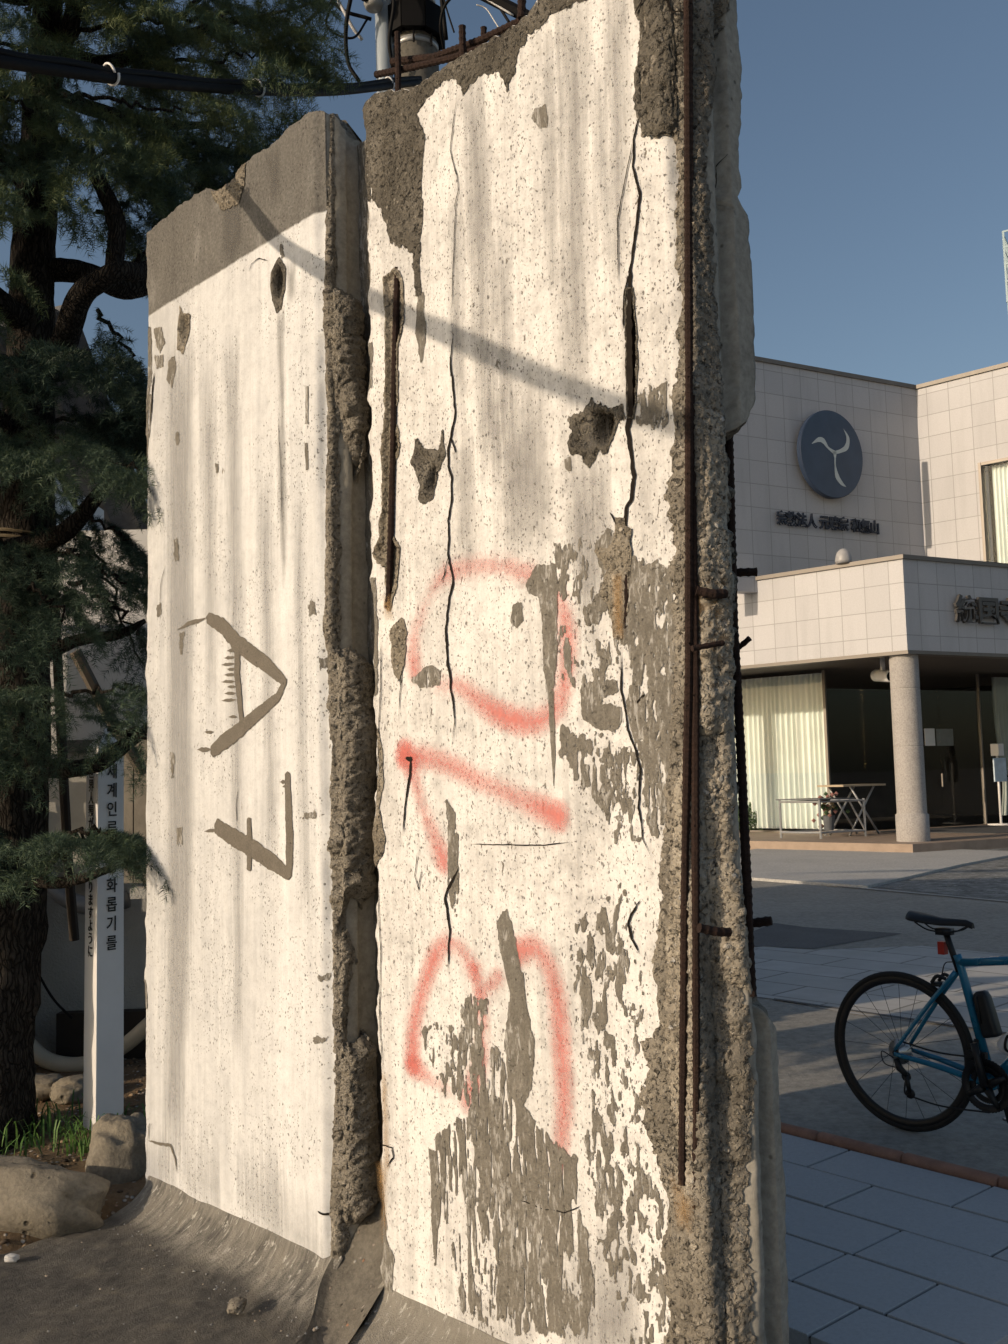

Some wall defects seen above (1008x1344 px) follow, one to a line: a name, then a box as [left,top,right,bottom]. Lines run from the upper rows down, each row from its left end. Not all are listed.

crack [635,0,683,13]
spalling [211,163,245,210]
spalling [270,244,286,313]
spalling [308,339,342,668]
spalling [324,115,338,289]
crack [441,95,459,742]
peeling [362,0,586,696]
crack [610,119,641,526]
spalling [421,0,773,1344]
spalling [372,728,385,866]
spalling [313,910,348,1104]
spalling [329,1141,351,1260]